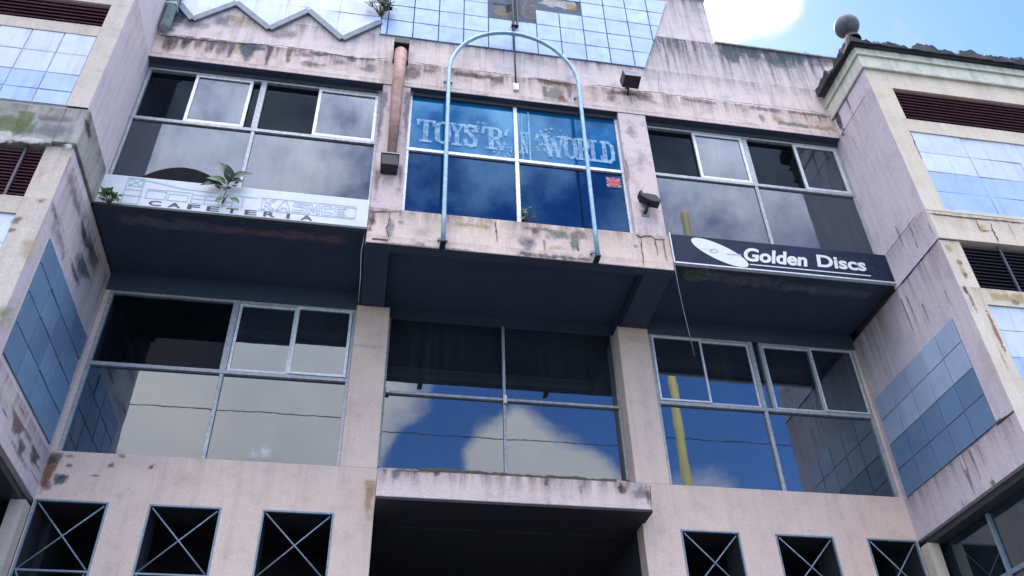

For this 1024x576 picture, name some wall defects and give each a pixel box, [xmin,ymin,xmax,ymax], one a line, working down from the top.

damp [163,9,311,65]
damp [720,46,833,75]
damp [0,111,70,135]
crack [370,210,401,238]
damp [521,226,589,261]
crack [635,233,659,263]
damp [1,384,68,488]
damp [393,468,439,477]